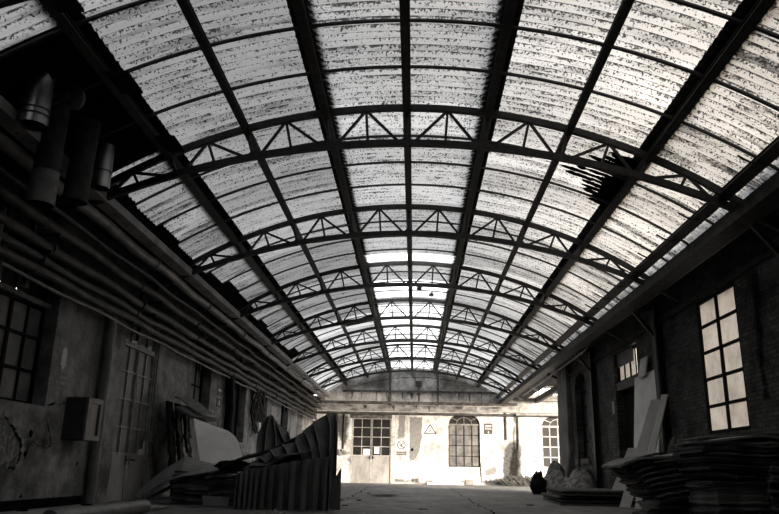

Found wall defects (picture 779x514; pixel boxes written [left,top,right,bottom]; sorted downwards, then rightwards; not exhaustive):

spalling [0,411,52,470]
flaking render [393,436,455,483]
flaking render [482,451,503,484]